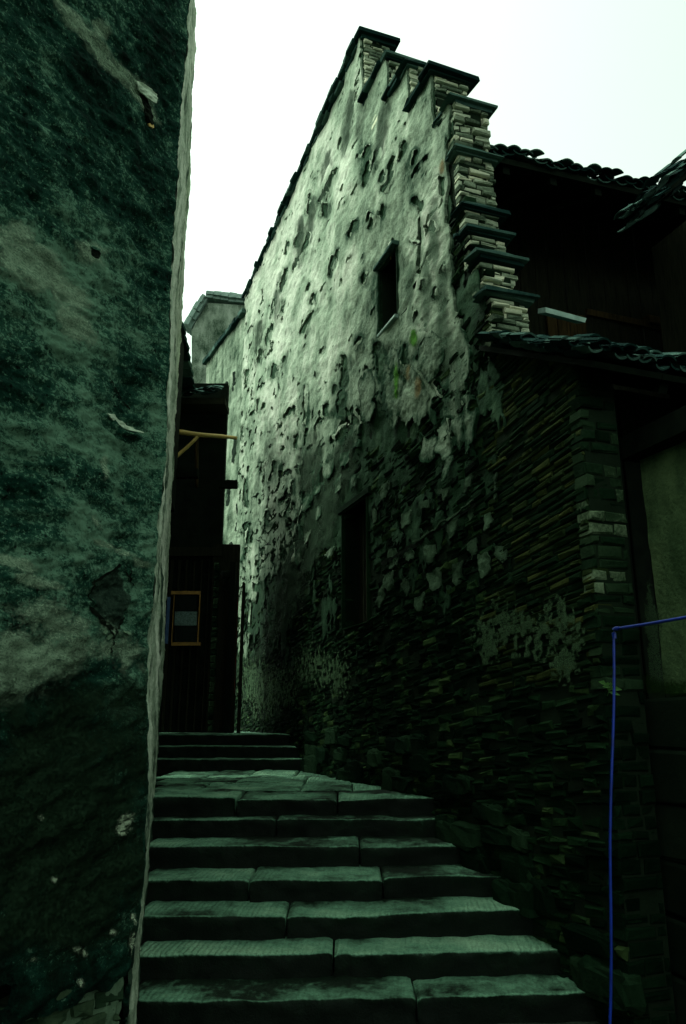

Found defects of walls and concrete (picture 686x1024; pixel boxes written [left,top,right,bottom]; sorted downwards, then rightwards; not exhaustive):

flaking render [136,81,158,128]
spalling [303,168,338,217]
spalling [347,139,418,238]
spalling [435,175,445,199]
spalling [409,196,448,309]
spalling [225,231,312,391]
spalling [298,280,318,335]
spalling [231,424,245,463]
flaking render [282,330,474,529]
flaking render [226,450,357,575]
flaking render [375,473,508,612]
spalling [88,564,133,640]